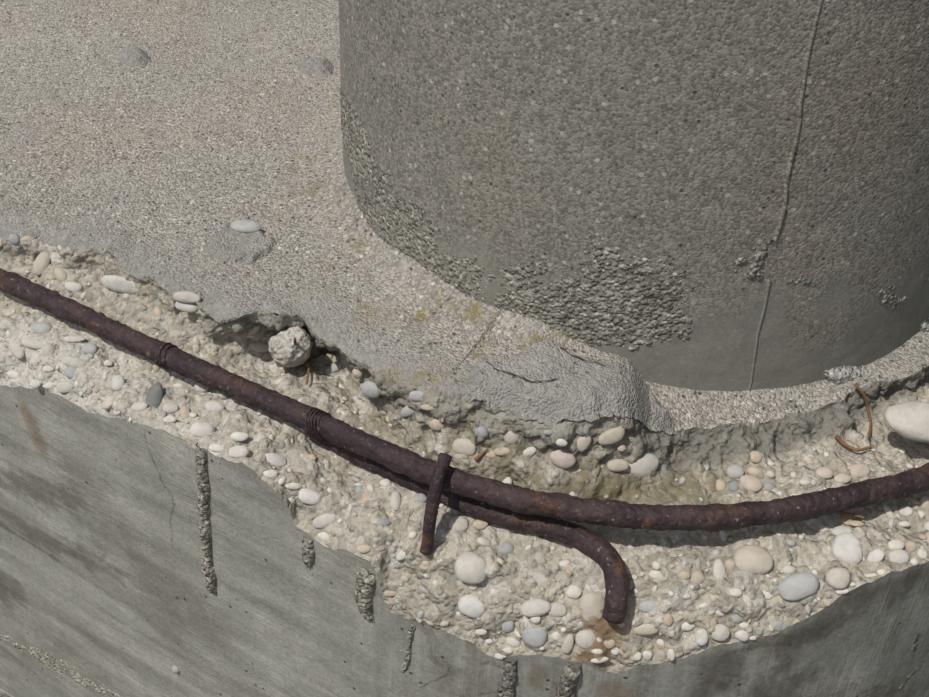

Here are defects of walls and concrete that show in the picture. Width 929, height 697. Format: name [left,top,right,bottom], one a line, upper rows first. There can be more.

peeling [207,220,277,265]
spalling [0,234,929,673]